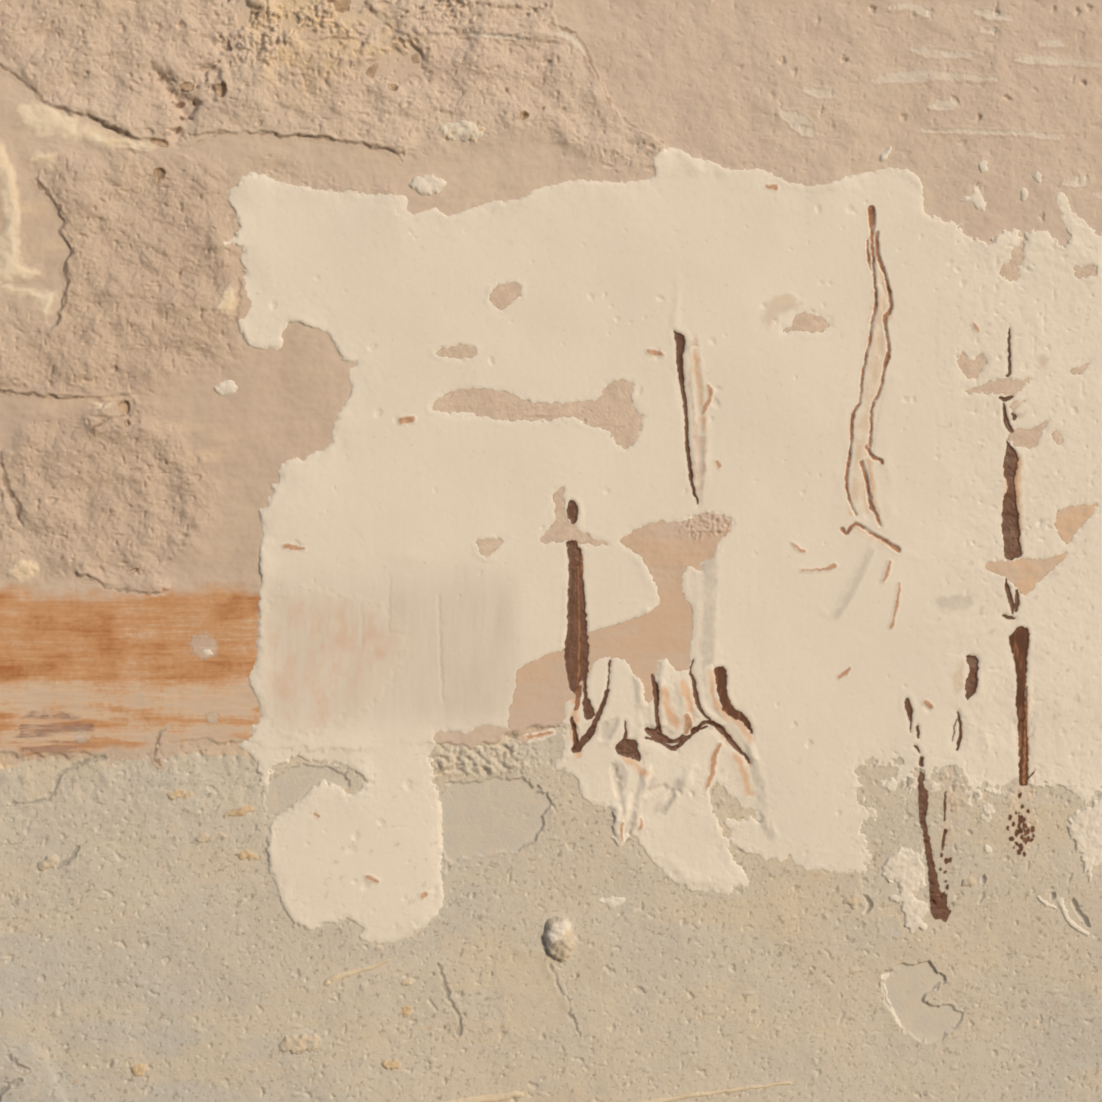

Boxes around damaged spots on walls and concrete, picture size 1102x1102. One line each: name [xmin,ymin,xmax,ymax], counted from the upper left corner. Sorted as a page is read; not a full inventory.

peeling [432,380,643,449]
crack [673,331,699,505]
crack [837,204,903,555]
rust [0,558,413,769]
peeling [508,487,732,743]
crack [564,500,753,764]
crack [999,328,1035,857]
peeling [984,504,1098,595]
spalling [438,772,554,868]
crack [905,698,952,922]
rust [1003,697,1041,855]
spalling [879,957,967,1046]